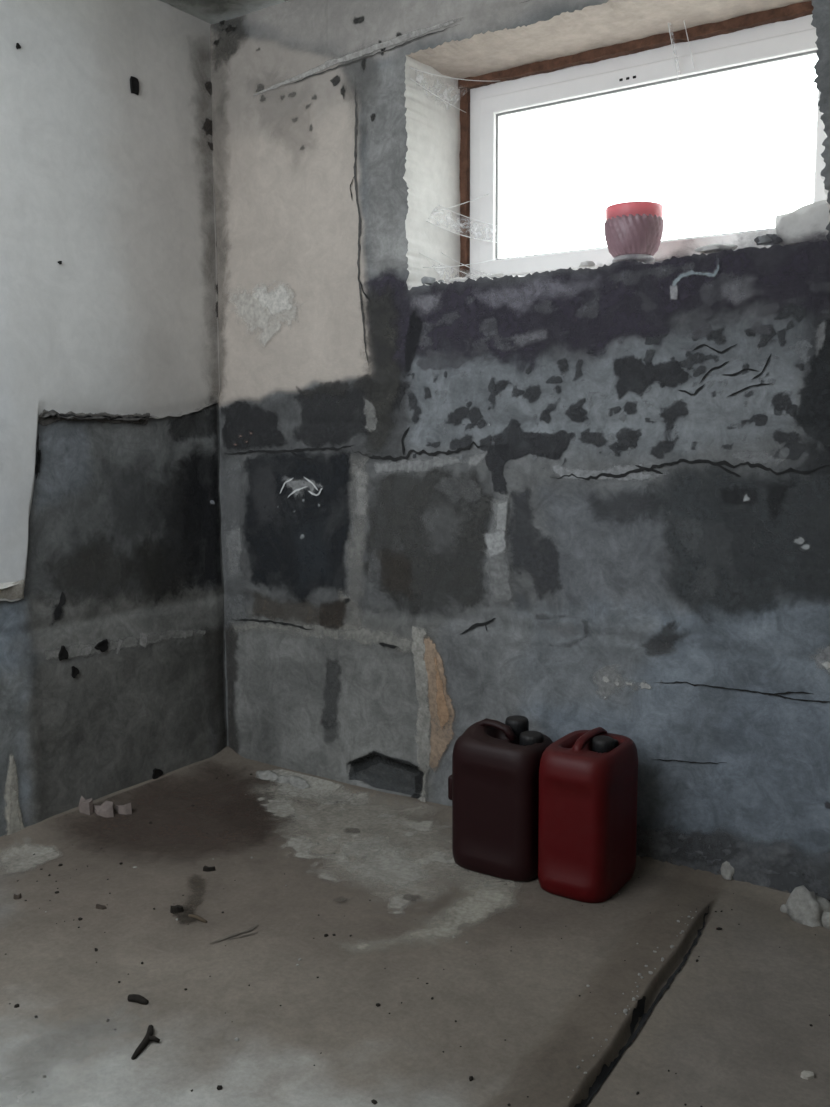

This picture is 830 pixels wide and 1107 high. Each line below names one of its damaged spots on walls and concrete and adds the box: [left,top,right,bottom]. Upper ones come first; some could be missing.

spalling [407,371,448,423]
spalling [426,303,830,495]
flaking render [35,410,156,479]
crack [552,451,830,481]
flaking render [0,580,25,600]
spalling [348,751,424,799]
crack [574,906,709,1107]